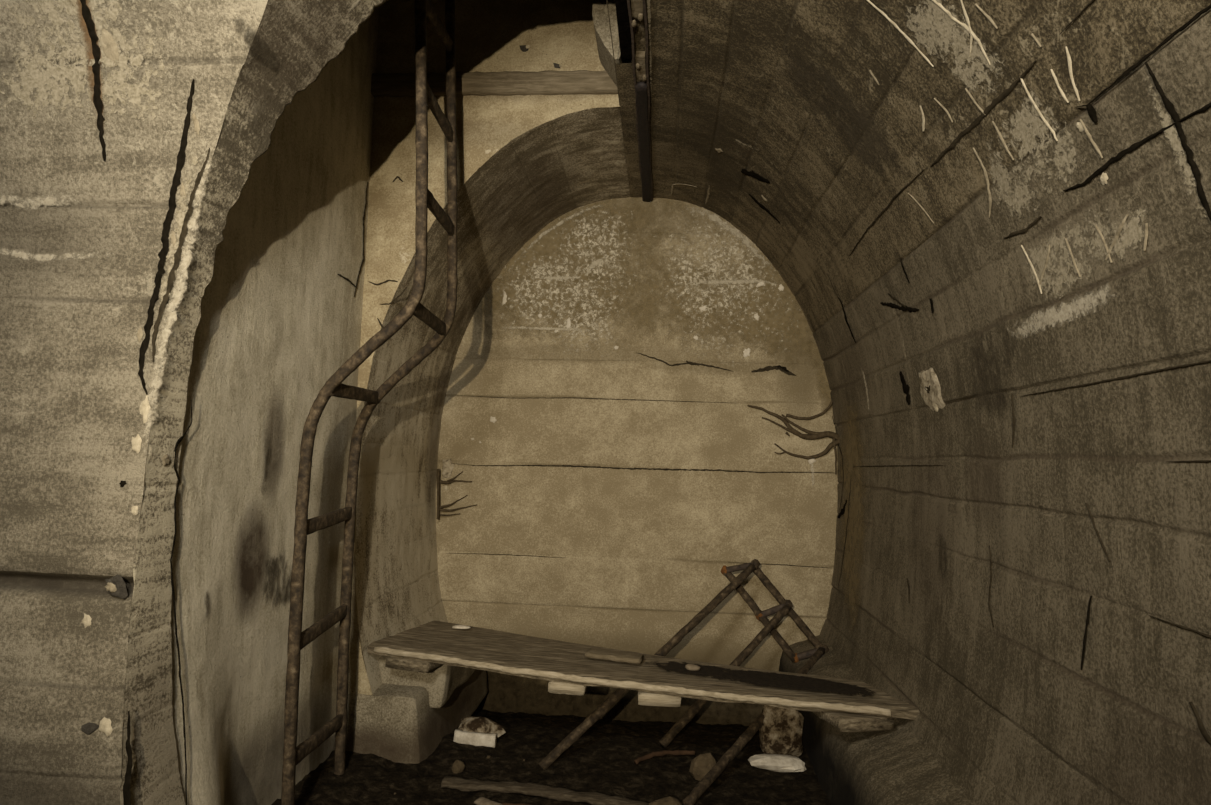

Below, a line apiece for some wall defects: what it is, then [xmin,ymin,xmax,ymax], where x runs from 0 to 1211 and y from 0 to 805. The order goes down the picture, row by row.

crack [69,0,120,161]
crack [1063,4,1211,221]
spalling [131,155,210,453]
crack [136,79,210,395]
crack [638,353,796,376]
spalling [899,368,946,412]
crack [827,60,1042,343]
crack [1011,360,1211,448]
crack [162,401,192,805]
water stain [265,557,291,605]
crack [452,416,942,586]
crack [123,711,133,805]